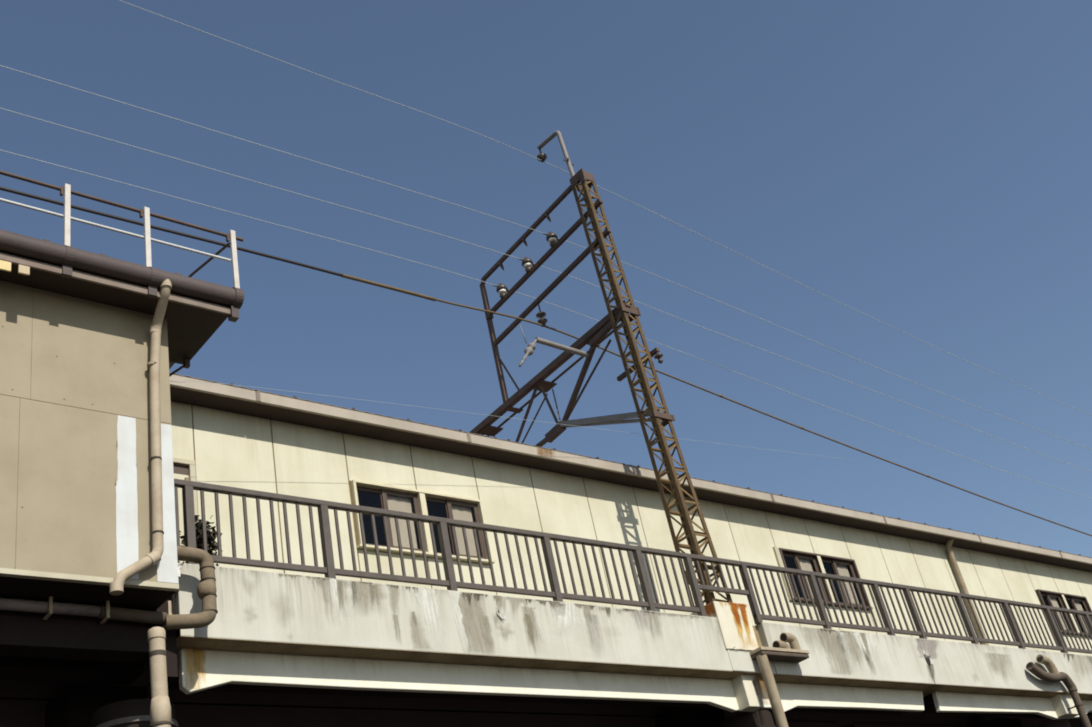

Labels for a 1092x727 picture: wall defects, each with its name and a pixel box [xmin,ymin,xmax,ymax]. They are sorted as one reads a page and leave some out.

damp [279,573,441,648]
damp [449,592,703,652]
rust [704,602,750,636]
damp [818,628,877,671]